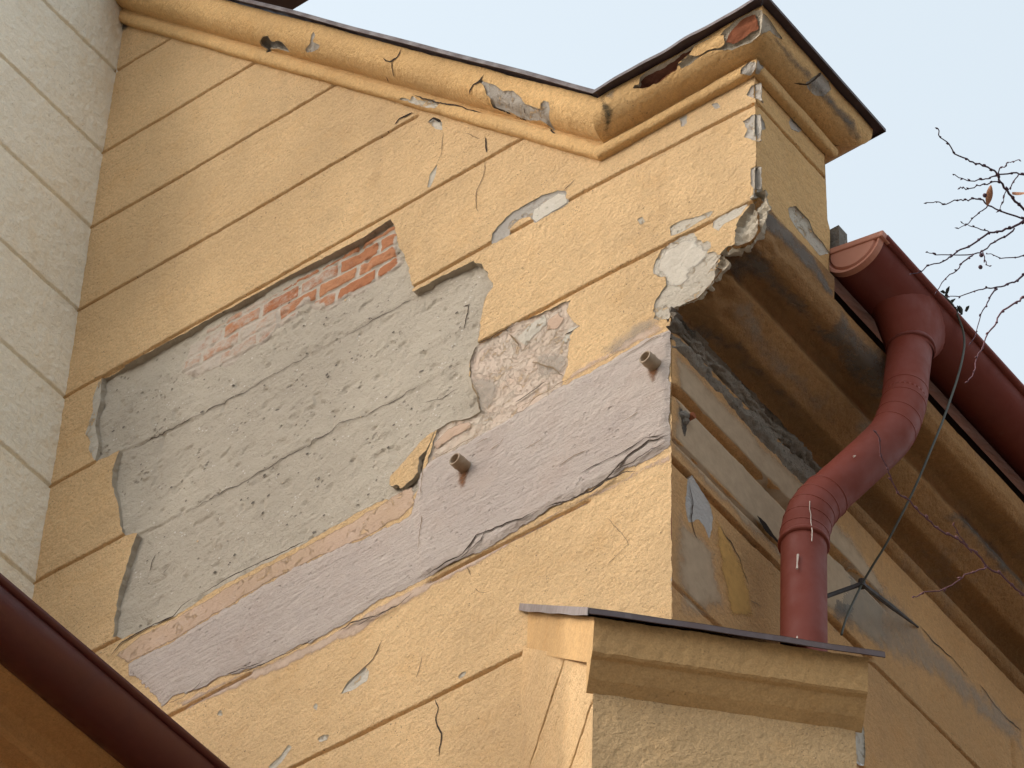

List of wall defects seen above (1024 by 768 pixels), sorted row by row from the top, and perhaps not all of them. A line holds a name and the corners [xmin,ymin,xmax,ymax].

flaking render [633,10,783,89]
crack [395,75,555,211]
peeling [473,80,555,131]
peeling [740,61,765,142]
peeling [491,190,570,244]
leakage [766,214,831,293]
peeling [788,206,830,256]
peeling [653,166,818,484]
flaking render [85,219,579,663]
peeling [685,475,713,538]
peeling [342,667,369,694]
crack [434,700,442,754]